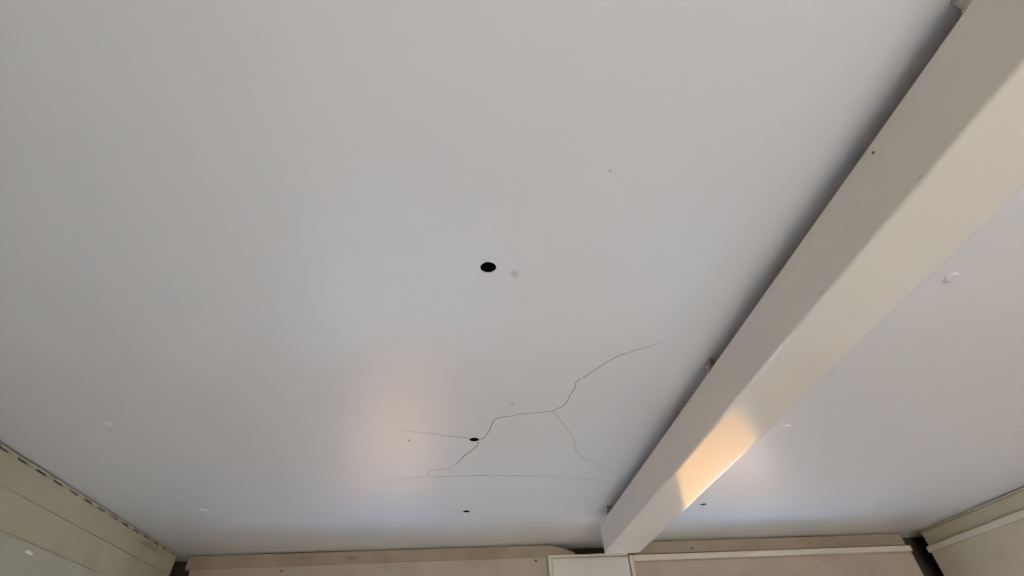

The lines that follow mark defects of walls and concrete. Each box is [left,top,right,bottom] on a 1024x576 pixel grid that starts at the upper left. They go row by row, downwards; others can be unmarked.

crack [395,340,667,481]